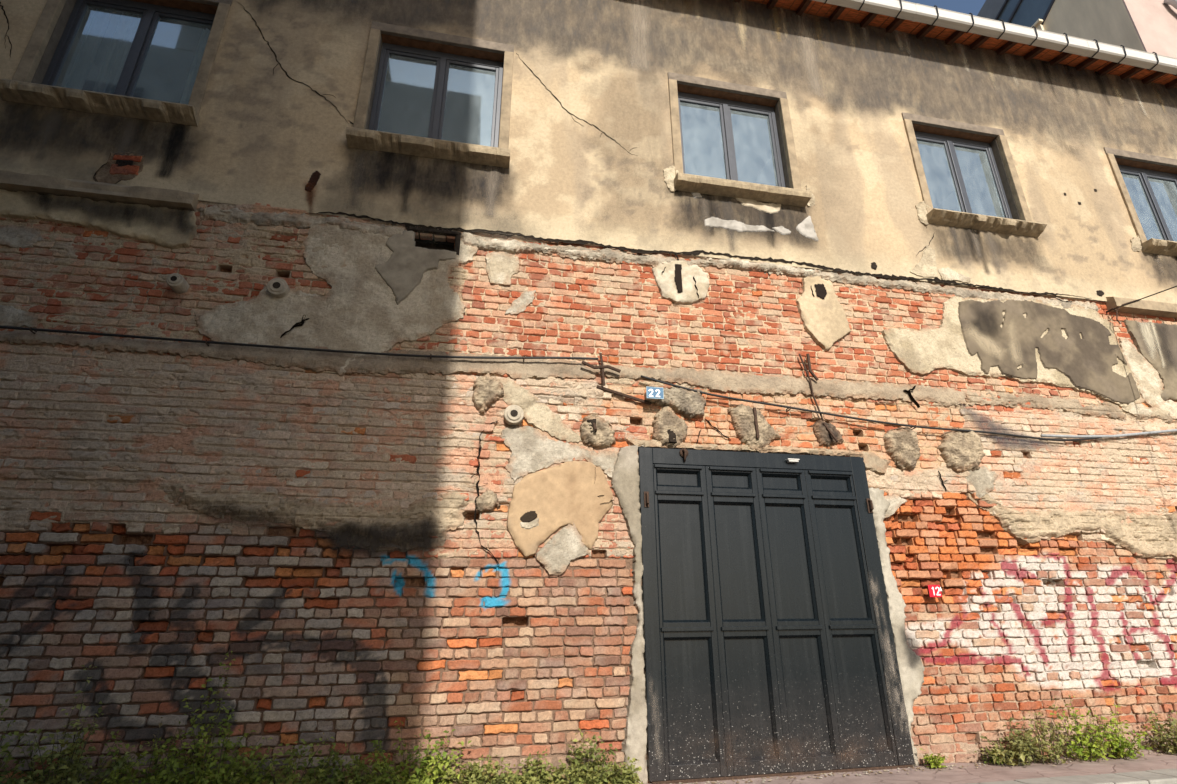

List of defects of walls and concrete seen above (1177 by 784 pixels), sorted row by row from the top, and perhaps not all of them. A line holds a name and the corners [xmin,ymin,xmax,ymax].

crack [0,2,12,57]
crack [239,3,354,125]
crack [516,53,634,155]
leakage [301,0,1177,149]
peeling [0,189,197,250]
peeling [704,185,819,241]
peeling [195,222,520,376]
peeling [505,290,536,315]
peeling [881,245,1177,419]
peeling [144,471,484,553]
peeling [498,377,618,576]
peeling [964,465,1177,562]